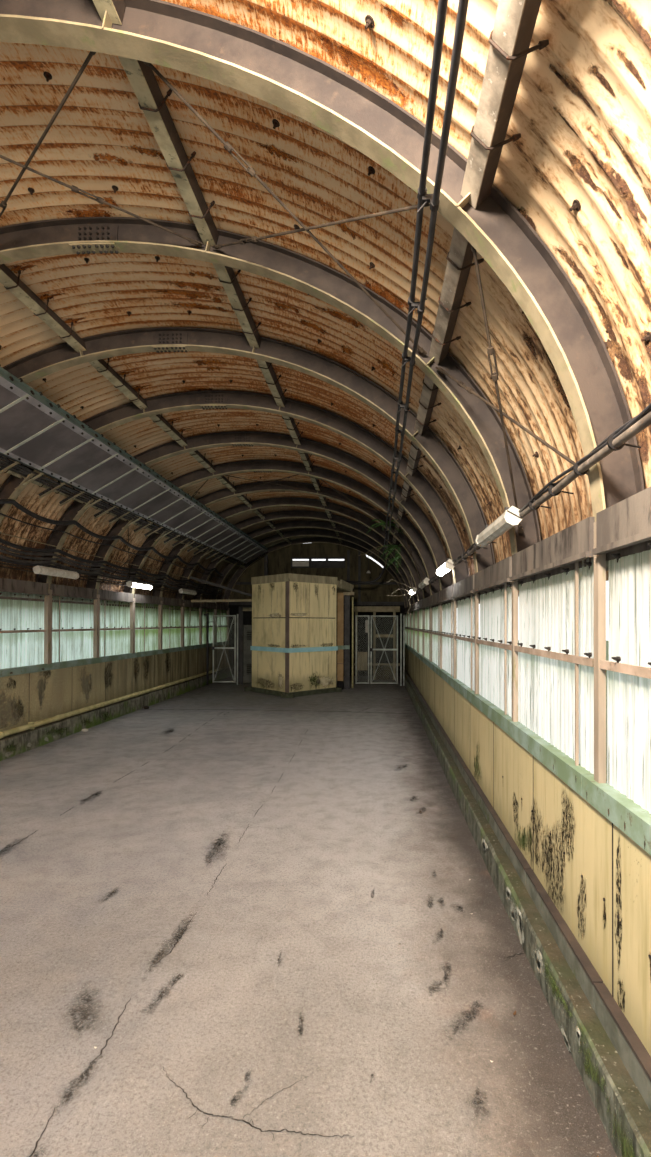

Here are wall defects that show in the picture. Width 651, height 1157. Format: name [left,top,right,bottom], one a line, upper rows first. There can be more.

rust [382,5,407,26]
rust [272,33,413,114]
rust [589,65,615,96]
rust [617,50,645,88]
rust [565,128,651,222]
rust [554,247,651,403]
damp [513,792,575,909]
damp [577,879,586,936]
mould [603,838,625,1009]
crack [87,998,131,1069]
crack [30,1108,55,1156]
crack [163,1067,354,1138]